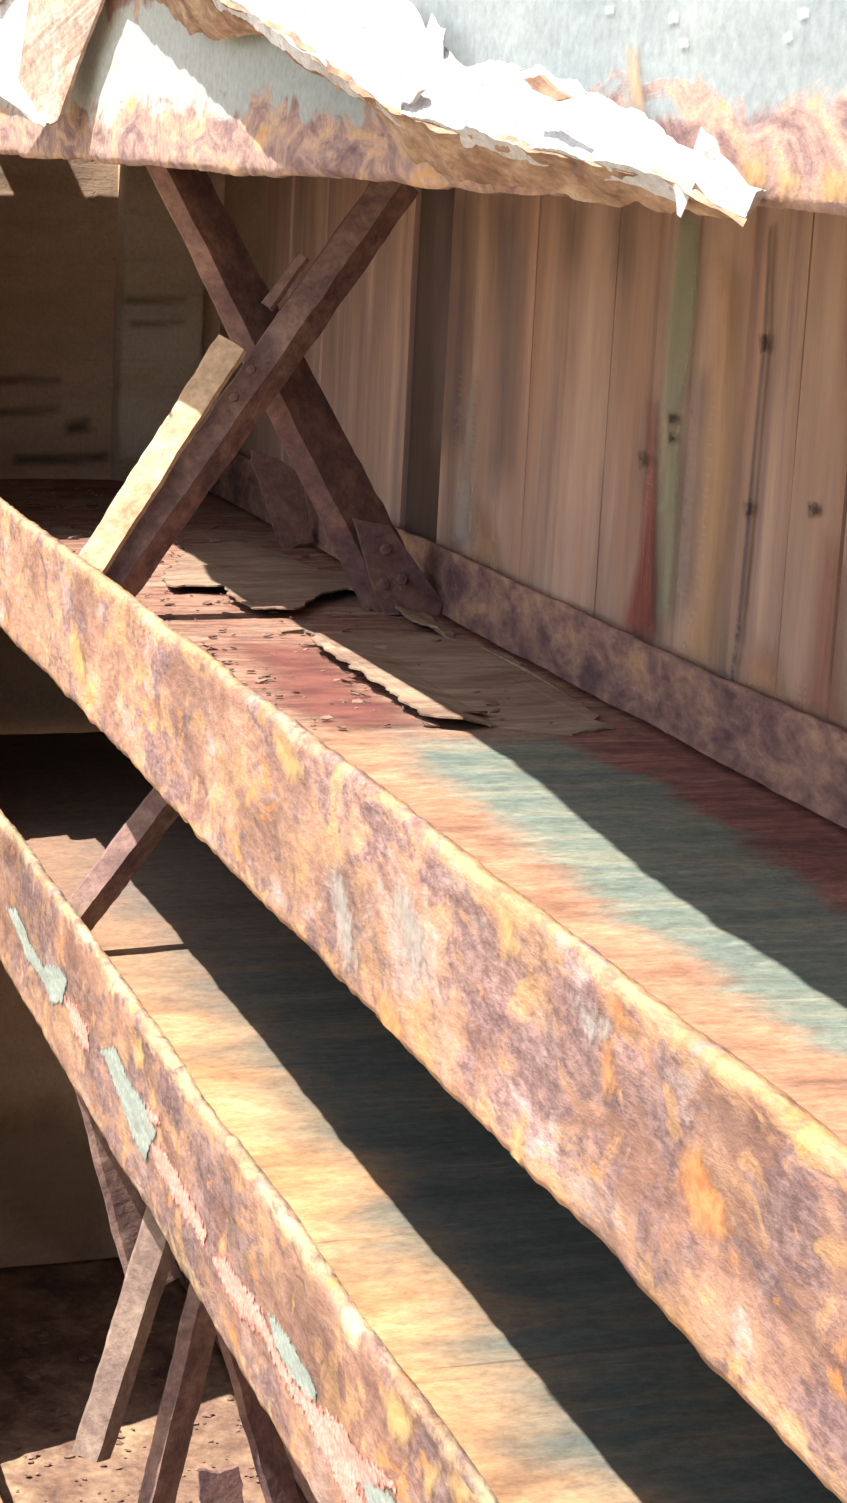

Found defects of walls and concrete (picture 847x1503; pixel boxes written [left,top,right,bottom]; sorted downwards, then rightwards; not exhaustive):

peeling [394,64,427,104]
peeling [523,75,577,102]
corrosion [630,53,643,111]
corrosion [624,416,656,636]
corrosion [252,646,408,725]
corrosion [747,658,779,696]
corrosion [277,739,300,777]
corrosion [379,994,401,1038]
corrosion [134,1041,143,1064]
corrosion [513,1129,522,1162]
corrosion [681,1150,725,1233]
corrosion [385,1397,409,1438]